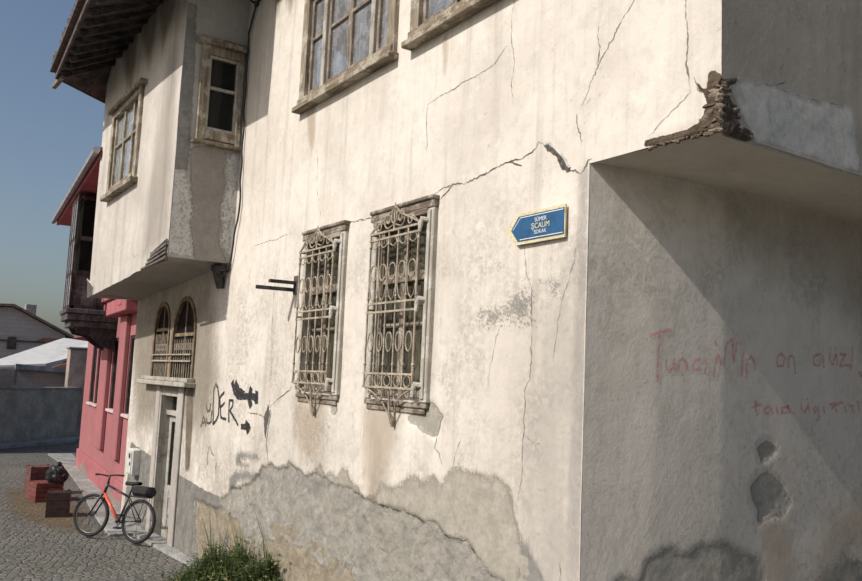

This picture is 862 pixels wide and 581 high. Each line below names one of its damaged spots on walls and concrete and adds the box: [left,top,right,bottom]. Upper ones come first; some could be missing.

peeling [169,4,240,262]
crack [436,141,544,197]
crack [570,0,634,174]
crack [649,0,702,136]
spalling [644,70,751,146]
flaking render [408,401,443,436]
crack [516,250,539,502]
flaking render [221,461,543,581]
flaking render [751,441,790,522]